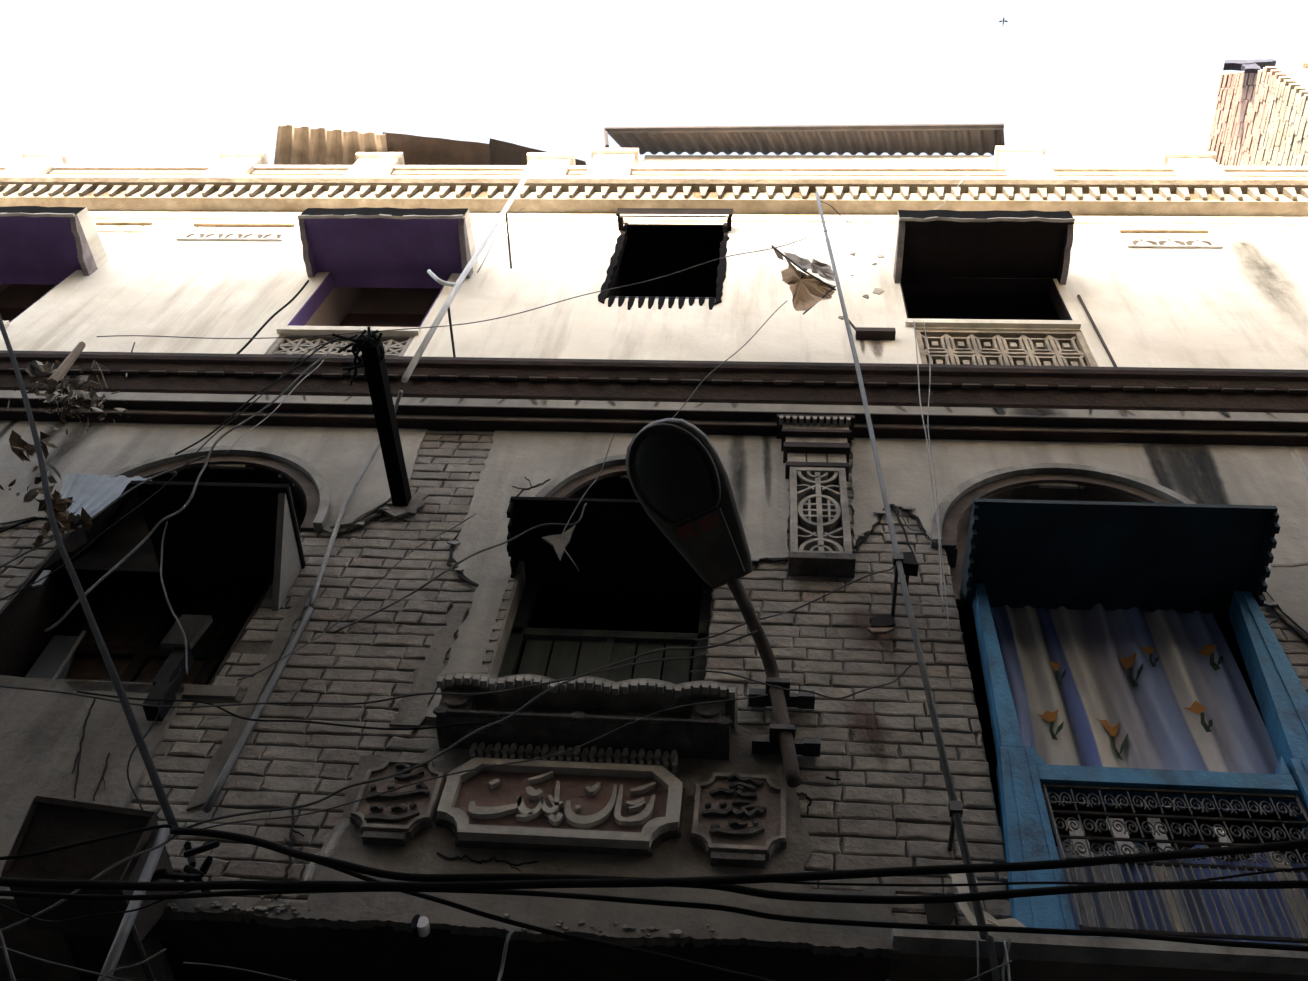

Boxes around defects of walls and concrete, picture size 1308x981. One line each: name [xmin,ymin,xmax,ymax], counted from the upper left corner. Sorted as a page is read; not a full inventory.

damp [1145,444,1229,505]
crack [72,698,110,801]